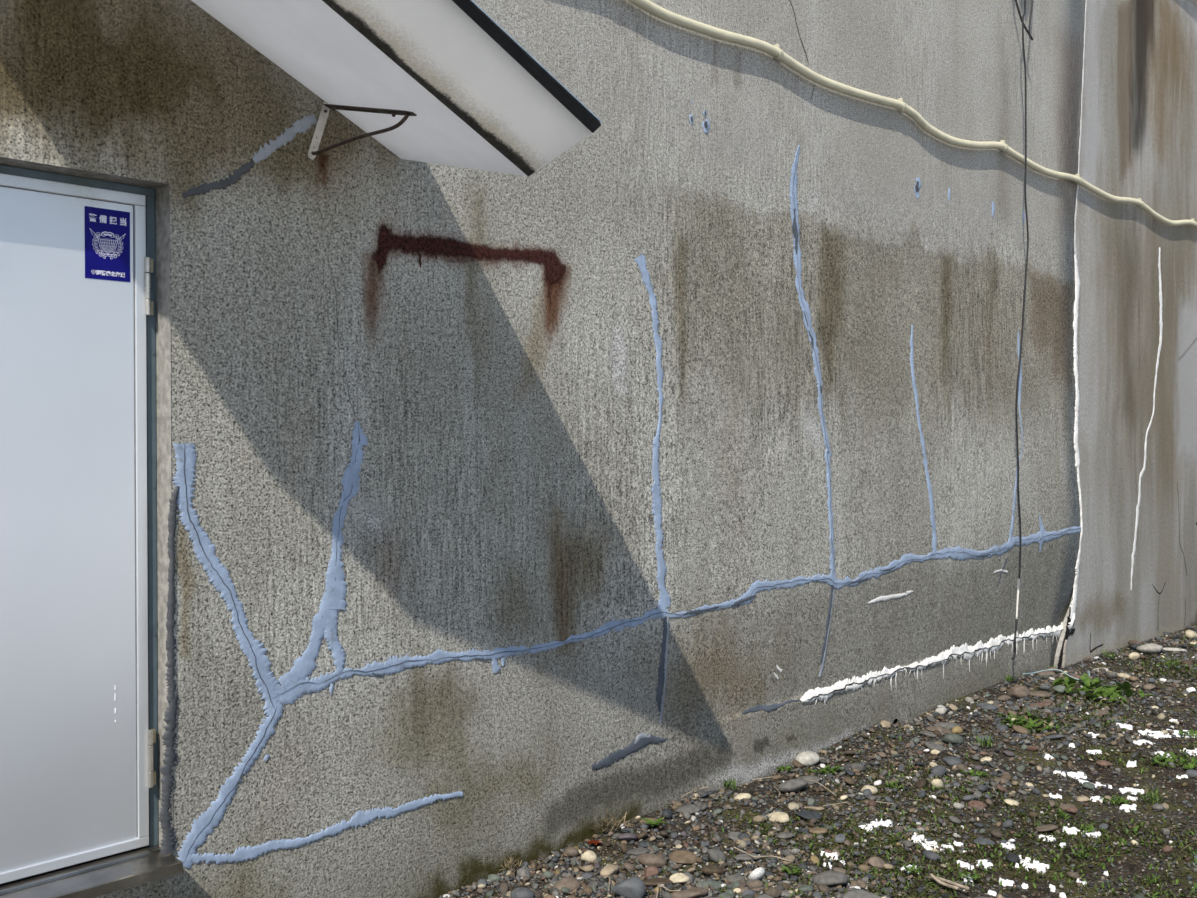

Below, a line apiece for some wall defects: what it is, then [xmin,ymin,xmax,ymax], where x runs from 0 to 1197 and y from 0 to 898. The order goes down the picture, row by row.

crack [182,114,317,198]
crack [790,1,815,100]
water stain [1080,0,1106,192]
water stain [1132,0,1154,146]
corrosion [366,226,566,327]
crack [172,145,1081,869]
crack [1131,247,1197,626]
water stain [1177,304,1197,457]